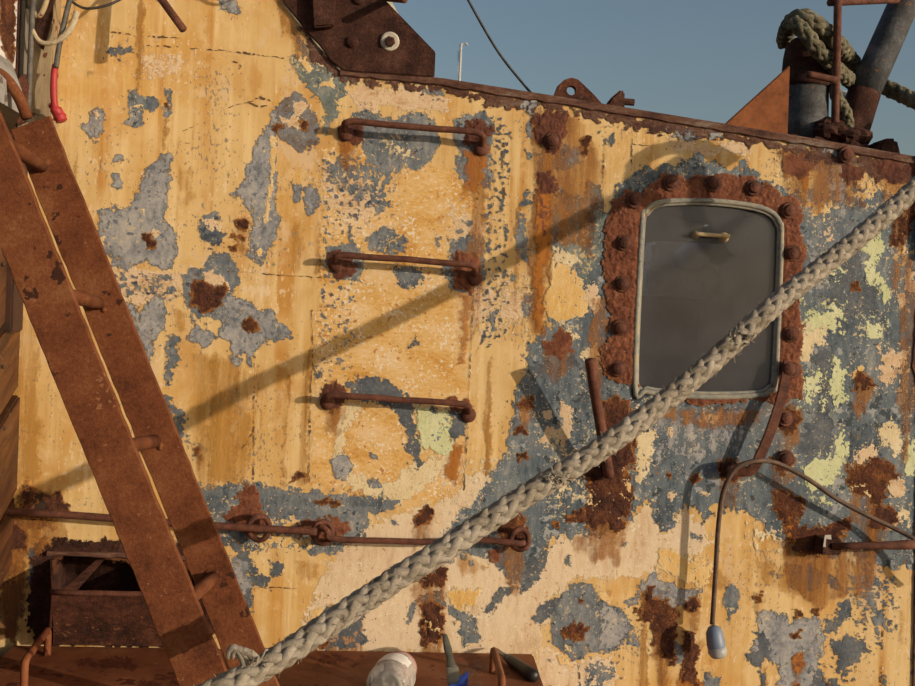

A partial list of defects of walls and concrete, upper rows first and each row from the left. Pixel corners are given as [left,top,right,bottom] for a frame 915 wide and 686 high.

peeling [81,33,474,475]
rust [272,91,320,153]
rust [280,9,915,376]
peeling [435,107,901,532]
peeling [198,451,401,613]
rust [414,566,458,653]
peeling [403,473,603,650]
rust [564,438,641,563]
peeling [532,546,713,686]
rust [634,585,704,686]
peeling [620,209,915,686]
rust [769,456,911,608]